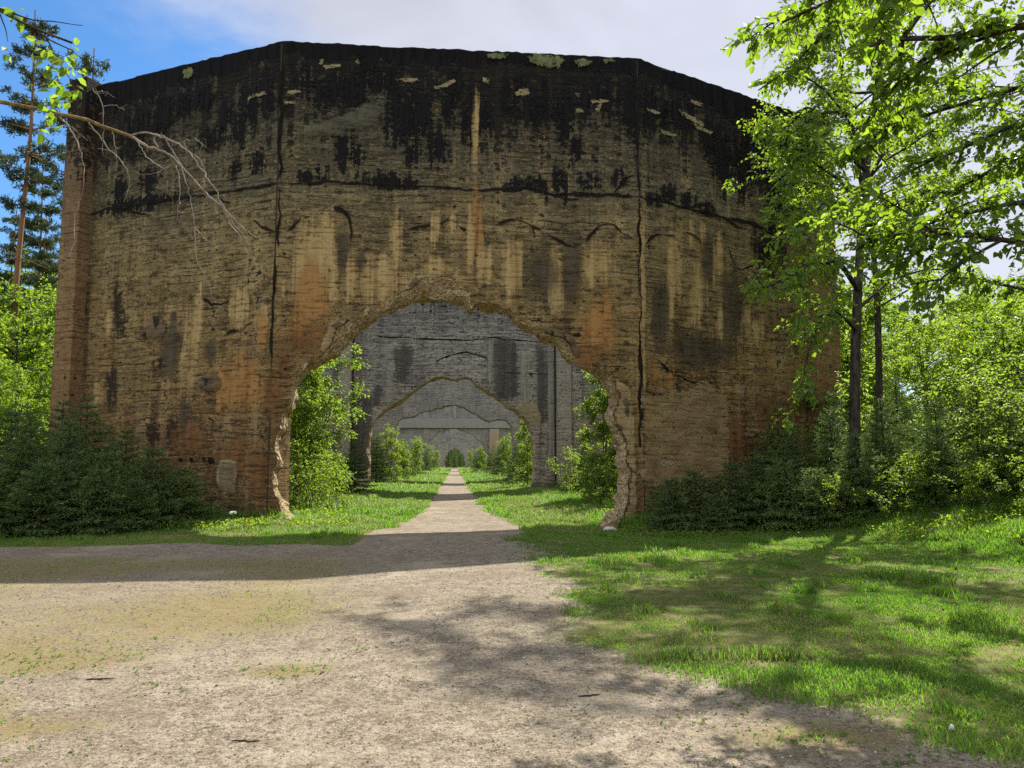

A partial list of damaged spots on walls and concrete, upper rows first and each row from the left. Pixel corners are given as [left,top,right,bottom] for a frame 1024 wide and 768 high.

crack [91,63,778,448]
water stain [92,42,801,410]
peeling [680,100,713,134]